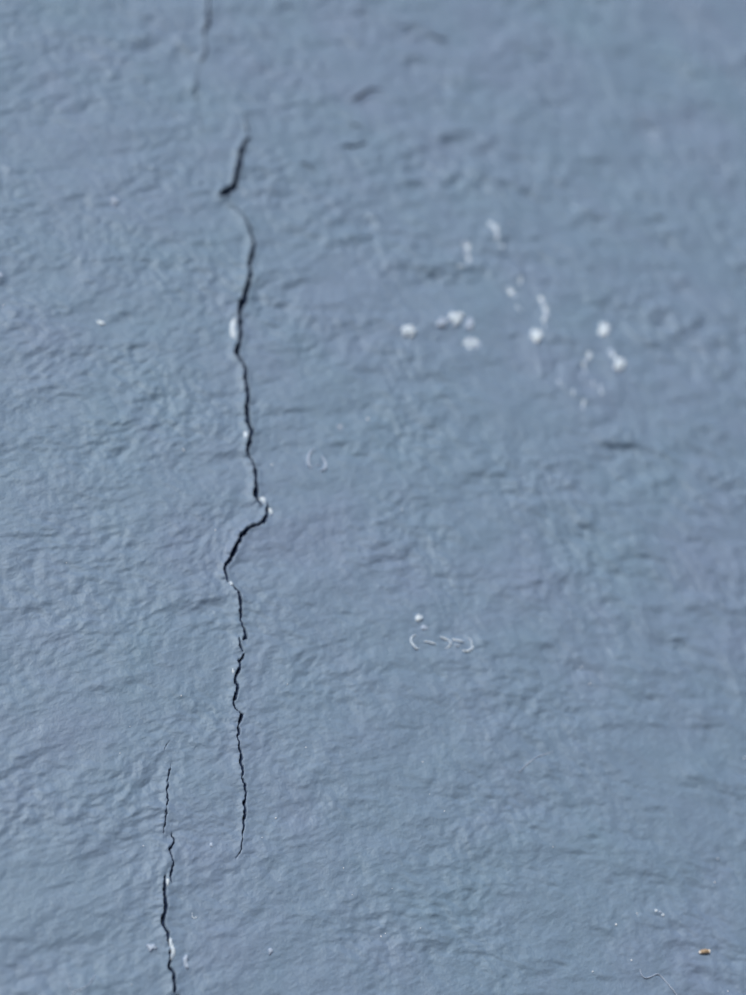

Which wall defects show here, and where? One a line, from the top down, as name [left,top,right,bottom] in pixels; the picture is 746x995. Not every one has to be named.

crack [195,0,210,131]
crack [219,116,273,857]
crack [161,744,176,993]